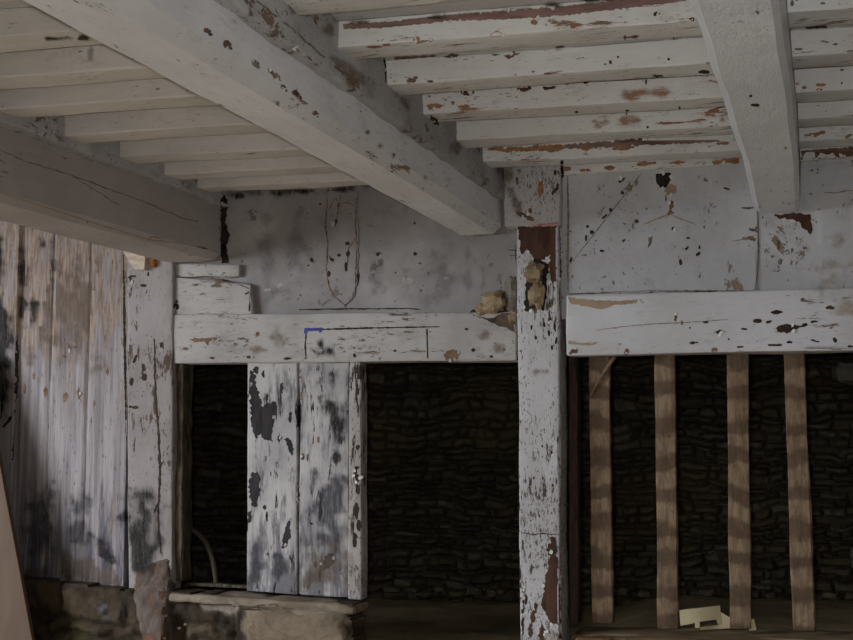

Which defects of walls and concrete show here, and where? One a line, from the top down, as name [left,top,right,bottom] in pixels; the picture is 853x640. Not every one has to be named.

peeling [343,0,687,37]
peeling [485,135,736,196]
spalling [774,212,813,234]
water stain [17,248,28,286]
peeling [470,208,572,350]
water stain [0,281,95,405]
peeling [741,310,818,346]
water stain [318,396,345,464]
water stain [62,496,118,585]
water stain [117,490,161,574]
water stain [309,475,349,545]
peeling [520,537,562,640]